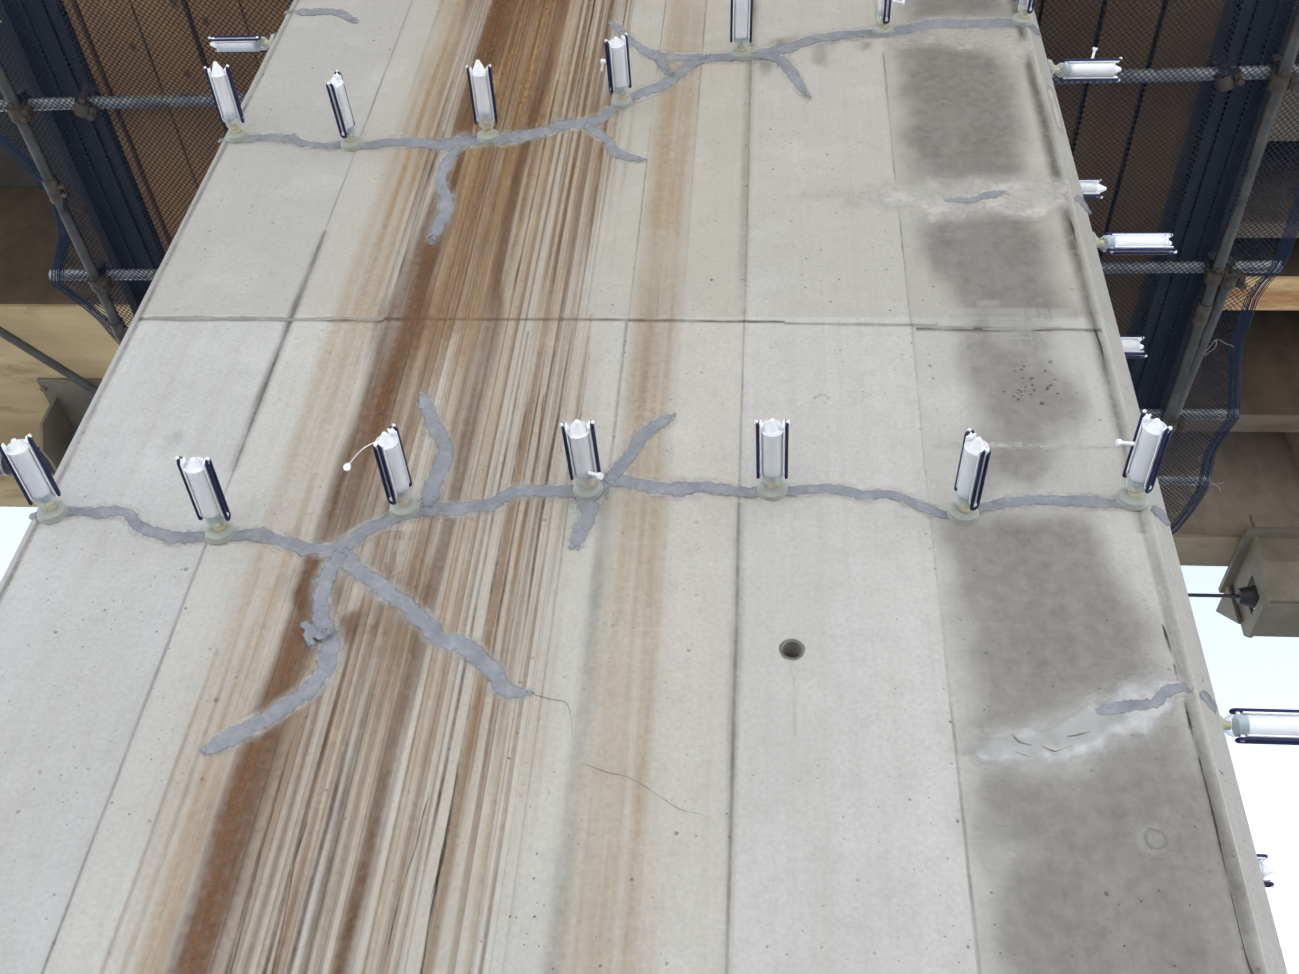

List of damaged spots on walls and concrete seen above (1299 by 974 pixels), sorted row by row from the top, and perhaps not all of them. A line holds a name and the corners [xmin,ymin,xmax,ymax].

crack [283,8,358,23]
rust [570,0,628,100]
crack [218,18,1042,244]
leakage [1048,88,1062,129]
leakage [850,124,1068,245]
crack [1071,196,1092,235]
rust [173,0,559,974]
crack [29,391,1171,756]
spalling [975,677,1217,765]